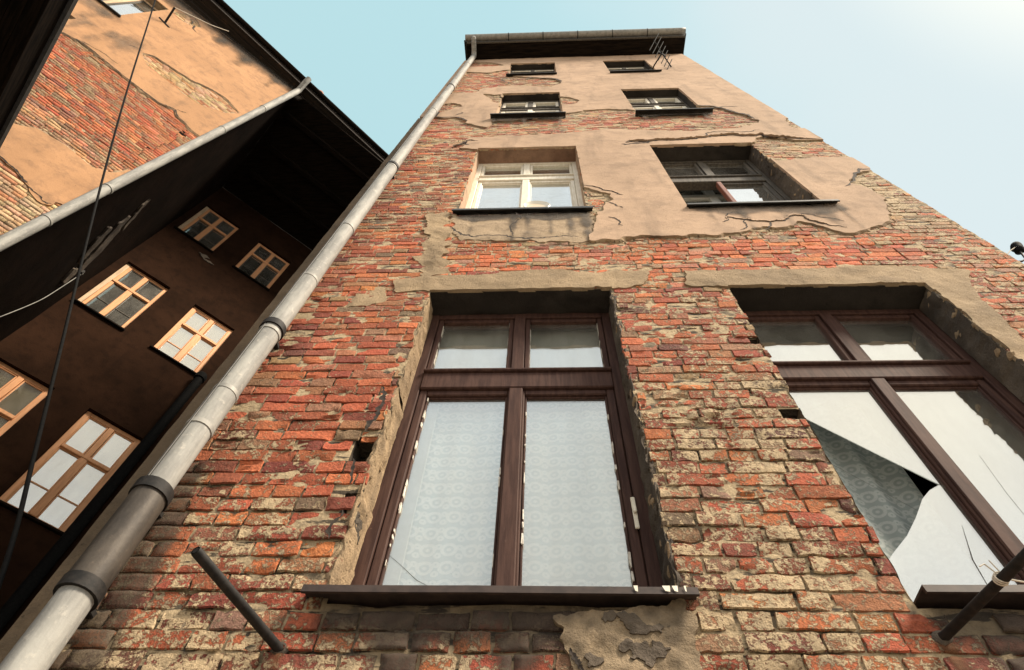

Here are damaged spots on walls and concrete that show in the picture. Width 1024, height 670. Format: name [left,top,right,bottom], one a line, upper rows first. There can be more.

peeling [13,33,199,172]
peeling [142,53,239,113]
peeling [438,62,759,142]
crack [624,105,816,145]
peeling [734,119,849,200]
crack [584,184,623,226]
peeling [579,170,959,244]
crack [722,213,846,230]
spalling [325,295,433,585]
spalling [553,290,702,670]